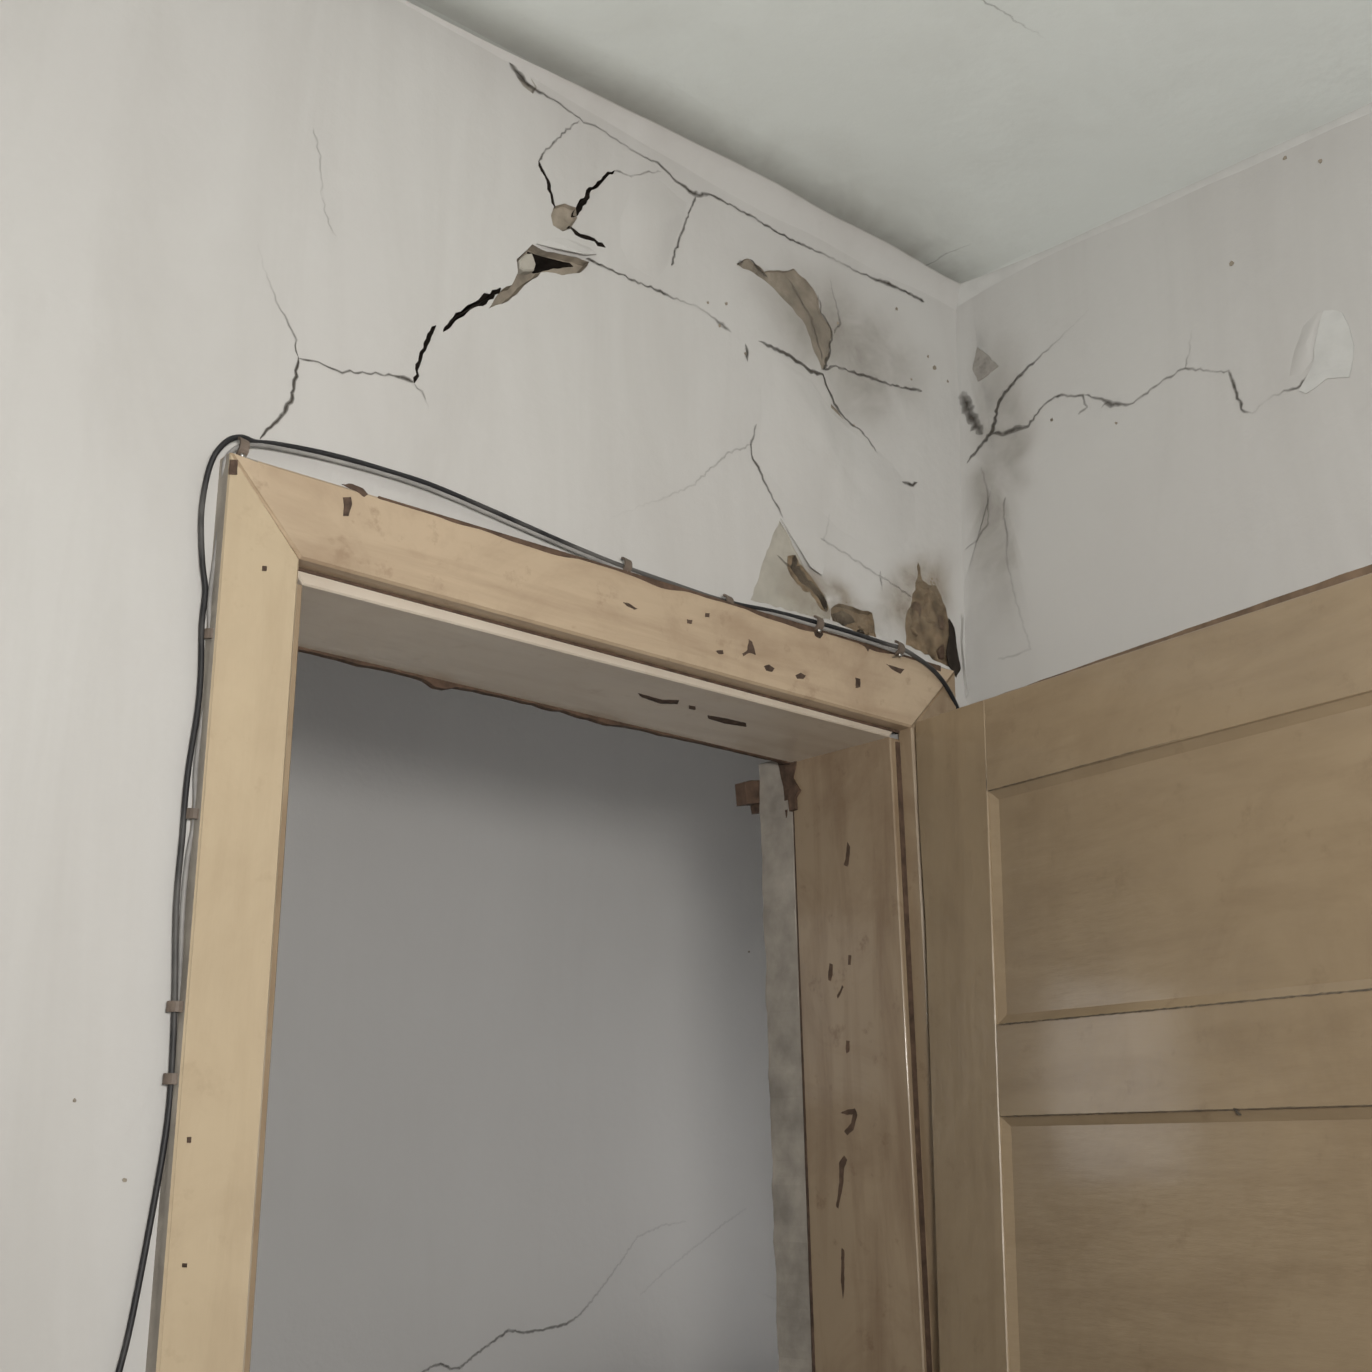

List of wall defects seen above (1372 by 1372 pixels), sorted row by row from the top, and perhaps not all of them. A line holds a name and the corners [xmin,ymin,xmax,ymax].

crack [510,63,812,295]
crack [260,288,501,439]
spalling [490,238,597,308]
peeling [737,258,832,370]
crack [745,344,917,449]
crack [857,271,924,302]
crack [967,363,1121,463]
crack [1230,374,1243,411]
peeling [229,459,238,475]
crack [750,439,780,510]
peeling [342,483,969,698]